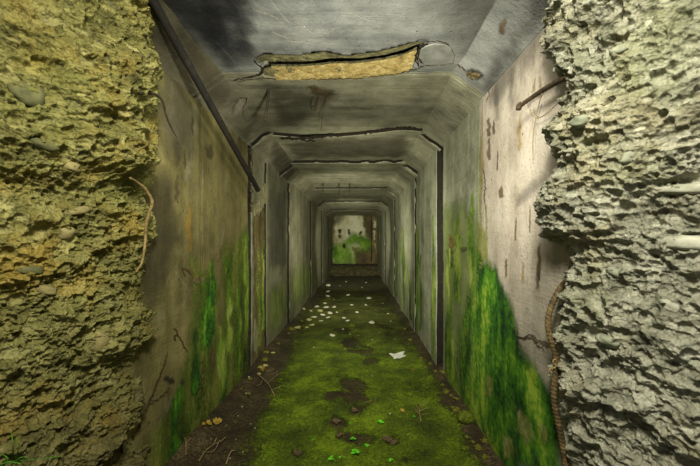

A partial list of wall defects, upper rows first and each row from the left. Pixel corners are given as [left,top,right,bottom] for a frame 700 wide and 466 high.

spalling [234,41,424,82]
spalling [466,69,483,80]
crack [280,126,422,142]
corrosion [487,119,498,170]
water stain [168,235,249,457]
water stain [445,195,558,453]
crack [517,334,550,350]